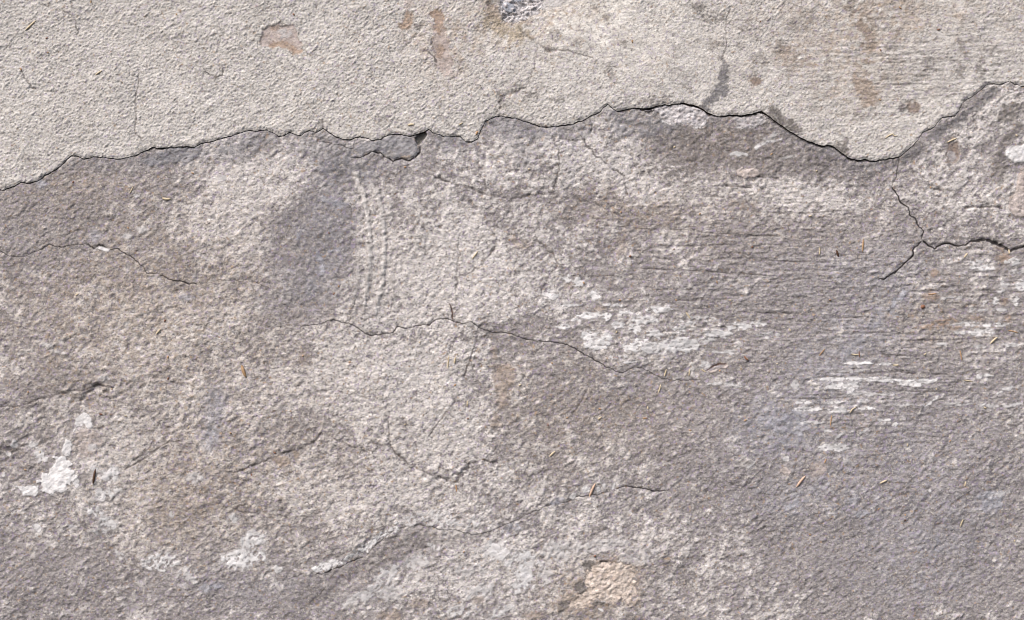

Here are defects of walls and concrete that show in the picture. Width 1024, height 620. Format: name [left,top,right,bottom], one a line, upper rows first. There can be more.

flaking render [354,136,417,158]
spalling [654,104,709,129]
spalling [733,114,766,129]
crack [0,81,1024,284]
crack [304,304,640,373]
peeling [6,412,93,496]
spalling [551,482,615,504]
spalling [311,510,483,572]
spalling [558,560,638,612]